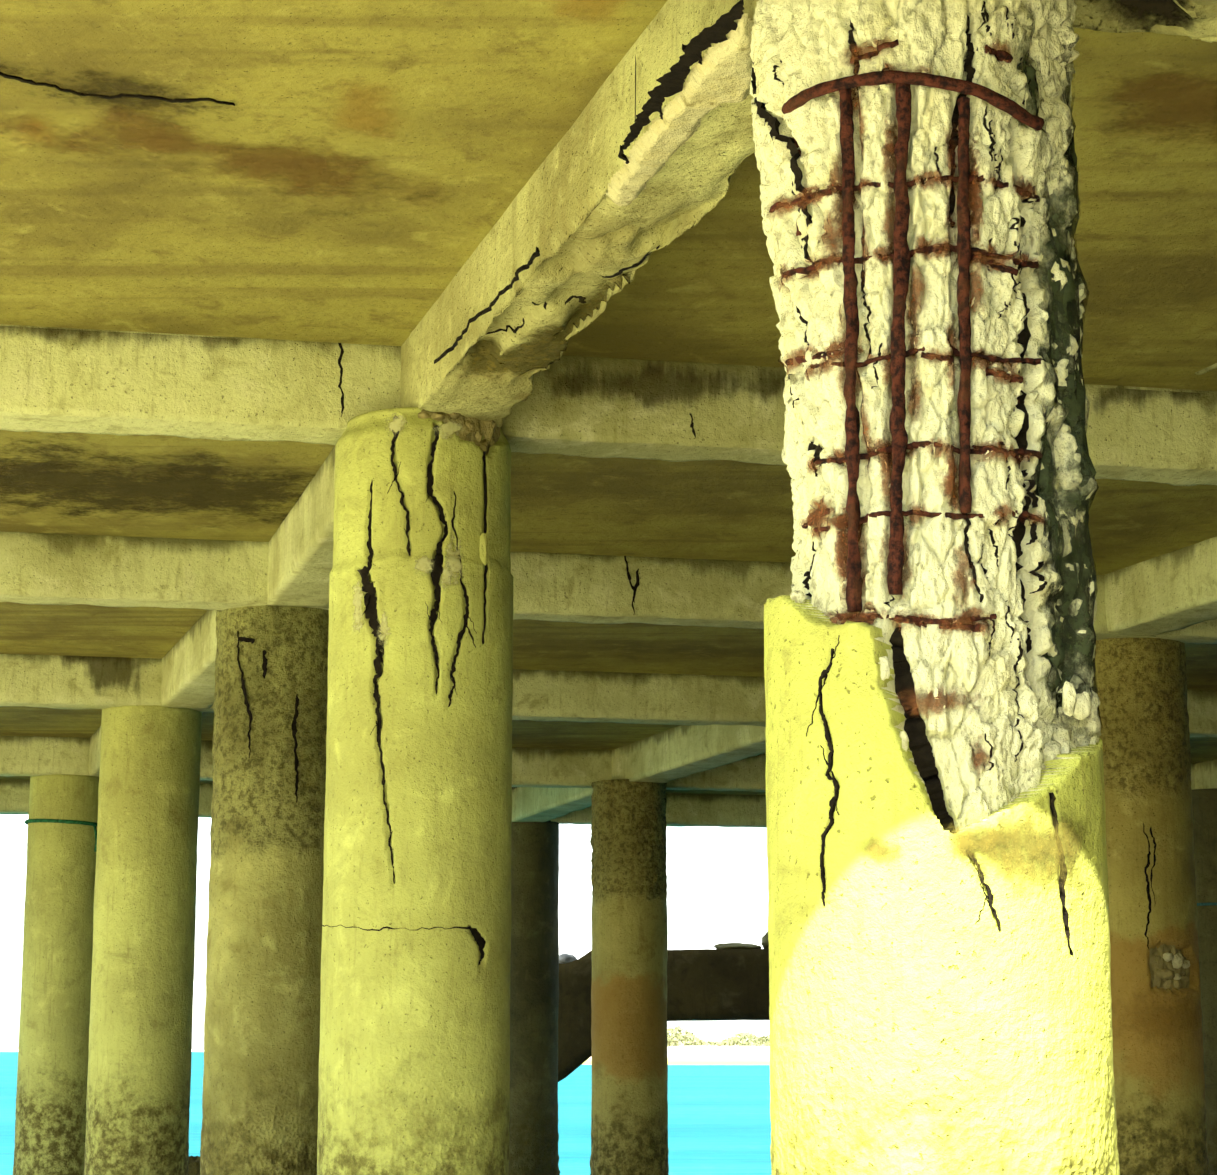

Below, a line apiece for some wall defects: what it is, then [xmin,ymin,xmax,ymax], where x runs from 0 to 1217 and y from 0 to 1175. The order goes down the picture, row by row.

spalling [465,273,631,375]
crack [618,0,744,164]
spalling [606,0,1101,830]
corrosion [780,313,959,508]
corrosion [861,115,1035,313]
crack [934,1,1047,781]
leakage [1034,78,1089,363]
leakage [1096,0,1192,30]
crack [357,415,488,884]
corrosion [802,499,876,624]
crack [884,595,1001,931]
leakage [1032,406,1099,710]